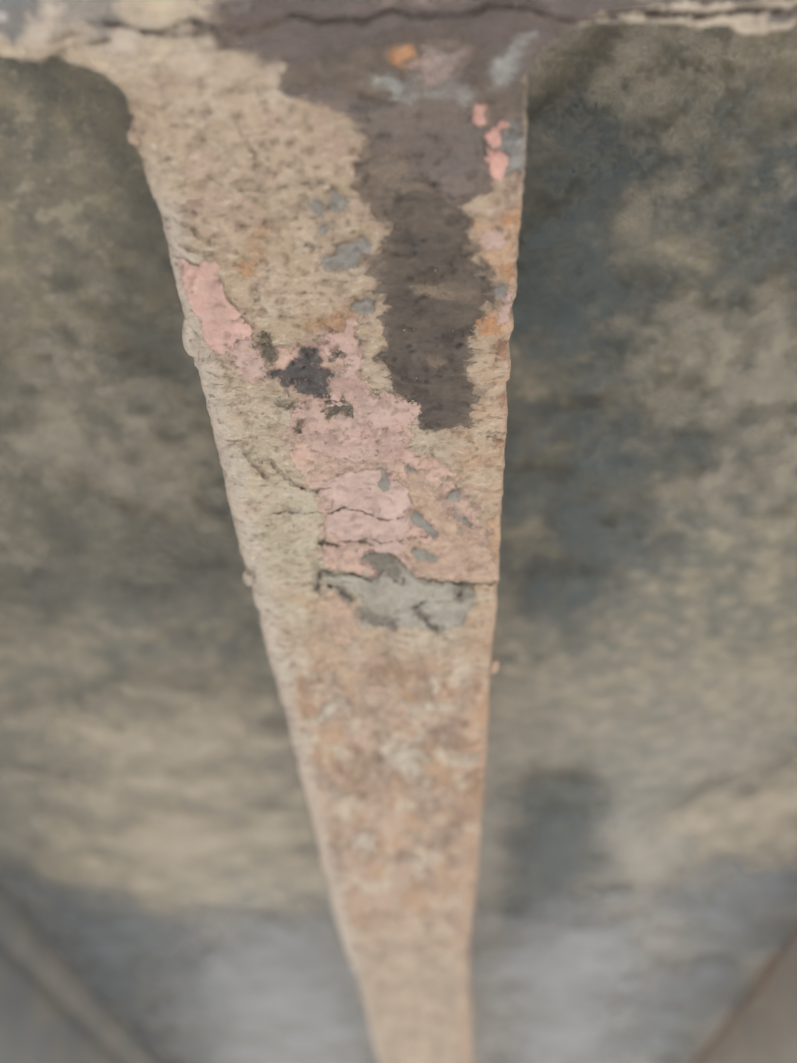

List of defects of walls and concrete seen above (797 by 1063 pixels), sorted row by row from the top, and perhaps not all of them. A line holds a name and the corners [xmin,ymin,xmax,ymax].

damp [0,0,42,71]
crack [45,4,797,55]
damp [0,295,234,588]
peeling [177,258,498,645]
damp [55,0,797,630]